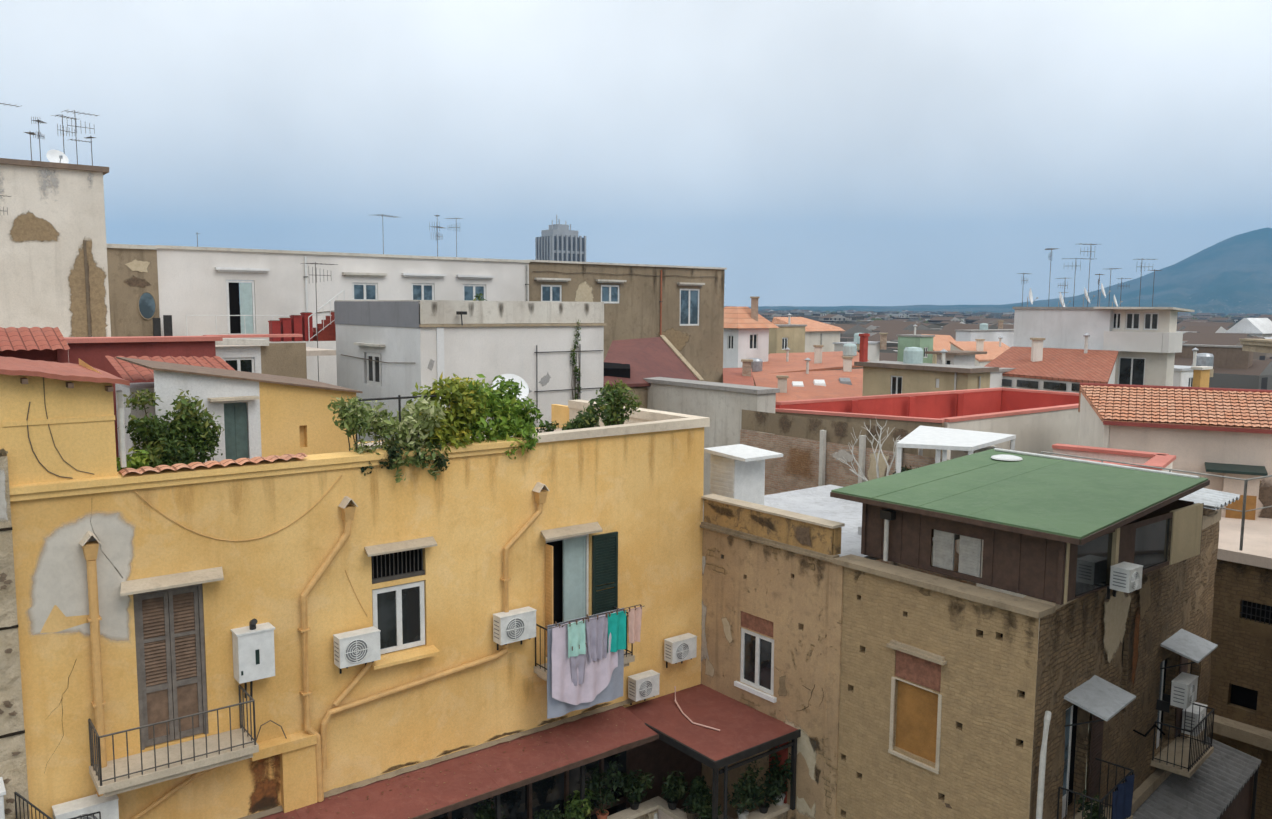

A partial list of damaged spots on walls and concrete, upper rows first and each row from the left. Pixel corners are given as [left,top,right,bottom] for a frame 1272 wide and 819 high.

leakage [708,503,734,517]
leakage [751,515,775,530]
peeling [28,513,134,640]
leakage [788,526,823,578]